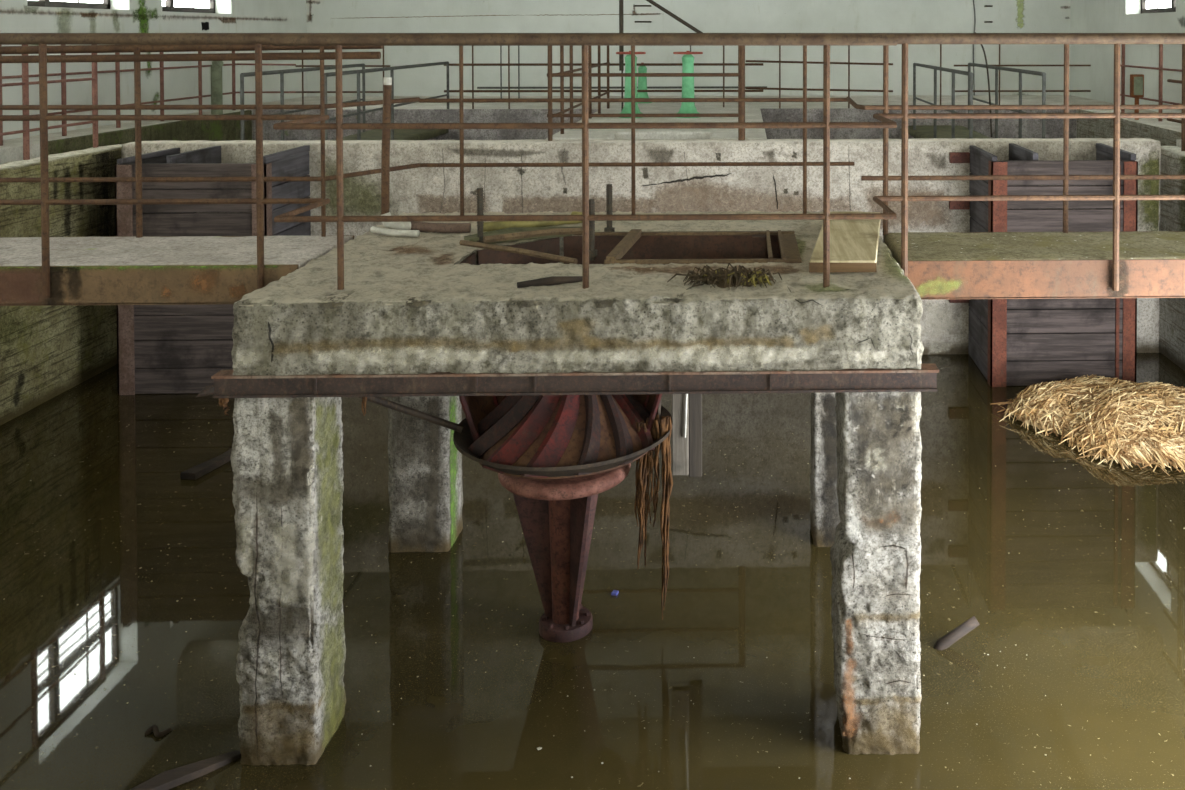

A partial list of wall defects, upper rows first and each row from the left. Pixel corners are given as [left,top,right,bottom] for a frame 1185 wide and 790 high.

damp [138,0,149,33]
crack [642,173,732,186]
rust [47,267,82,305]
rust [1108,261,1128,298]
damp [243,397,316,504]
crack [254,492,283,759]
rust [842,619,861,736]